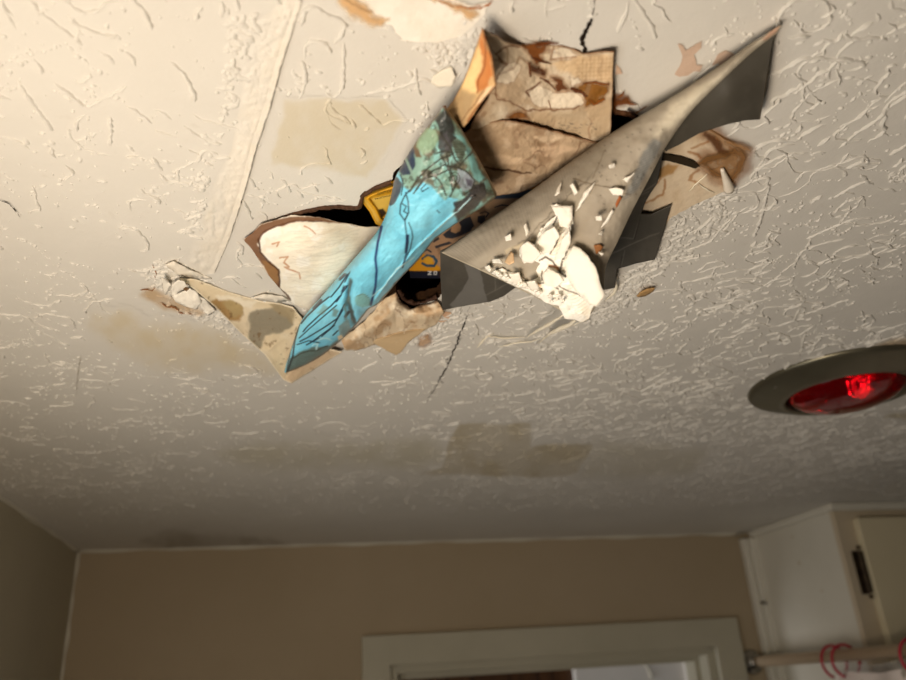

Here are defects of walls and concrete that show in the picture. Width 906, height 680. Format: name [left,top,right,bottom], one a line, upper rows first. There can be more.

flaking render [357,0,488,43]
crack [579,0,595,53]
peeling [162,25,781,383]
crack [428,308,470,399]
leakage [211,421,714,484]